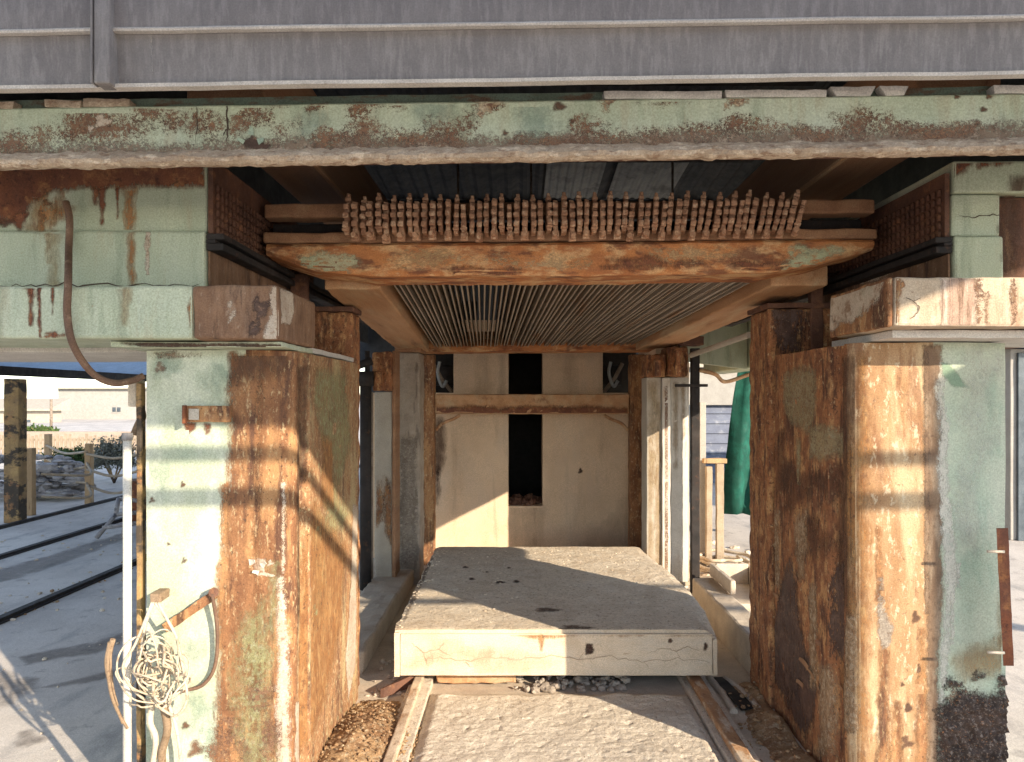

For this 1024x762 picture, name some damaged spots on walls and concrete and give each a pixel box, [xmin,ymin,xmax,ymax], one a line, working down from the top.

crack [195,106,229,143]
rust [0,104,480,154]
rust [503,95,995,145]
rust [0,167,205,293]
rust [600,255,703,271]
rust [25,287,65,338]
rust [974,278,990,324]
rust [1009,278,1018,325]
rust [122,343,346,762]
rust [827,428,862,687]
crack [412,642,709,669]
rust [775,558,817,736]